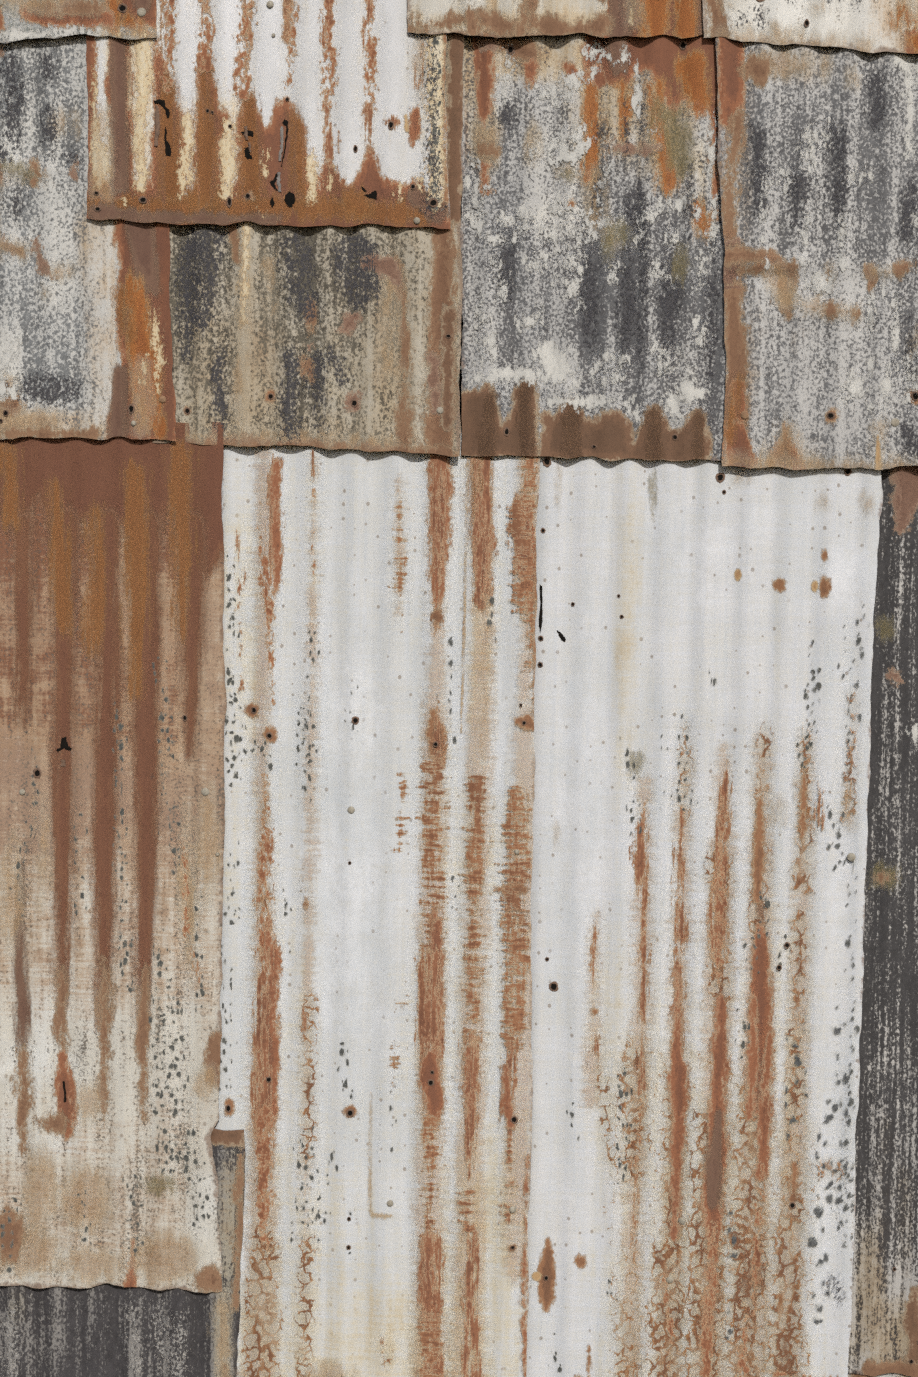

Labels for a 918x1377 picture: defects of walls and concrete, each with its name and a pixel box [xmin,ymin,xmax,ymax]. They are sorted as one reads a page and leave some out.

corrosion [889,4,918,54]
corrosion [863,259,917,292]
corrosion [823,299,861,324]
corrosion [875,436,918,536]
corrosion [0,0,808,1164]
corrosion [811,548,832,598]
corrosion [389,674,557,1377]
corrosion [587,693,918,1377]
corrosion [194,773,317,1377]
corrosion [0,1204,29,1272]
corrosion [123,1238,137,1287]
corrosion [574,1253,587,1268]